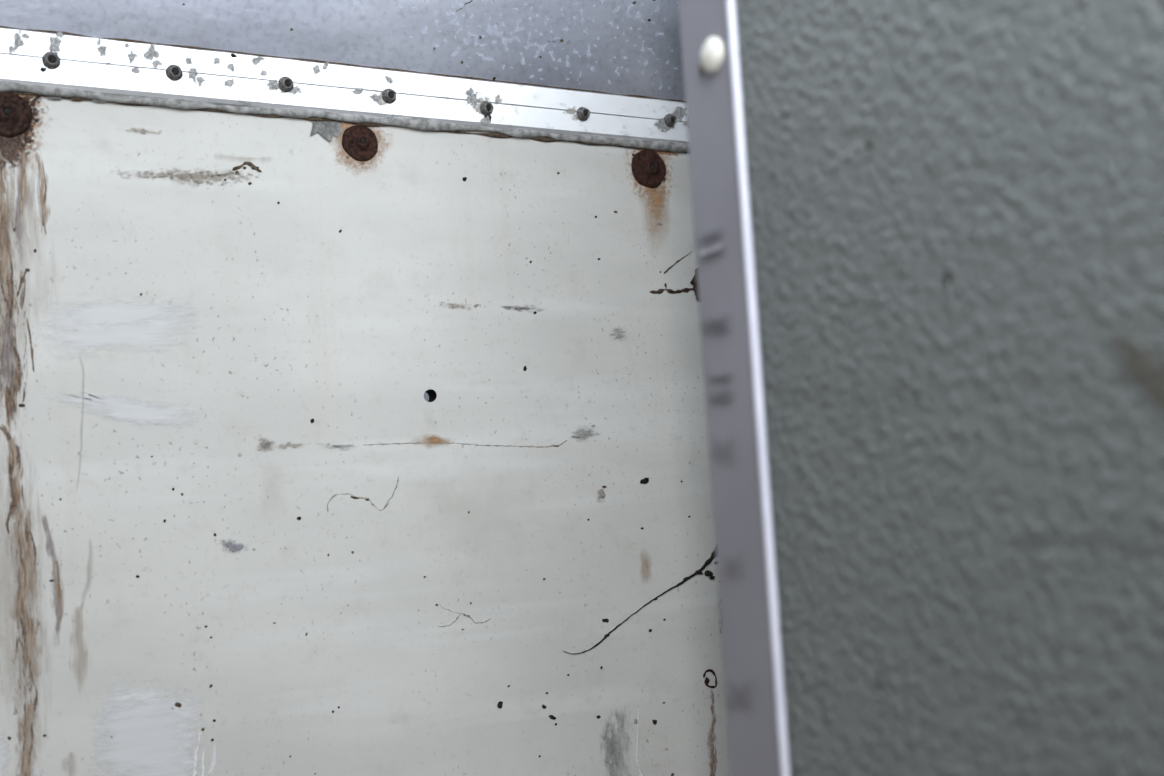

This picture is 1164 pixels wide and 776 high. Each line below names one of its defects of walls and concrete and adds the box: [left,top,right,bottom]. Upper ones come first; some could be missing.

corrosion [352,76,394,120]
corrosion [338,122,381,166]
corrosion [632,149,687,225]
corrosion [0,92,62,776]